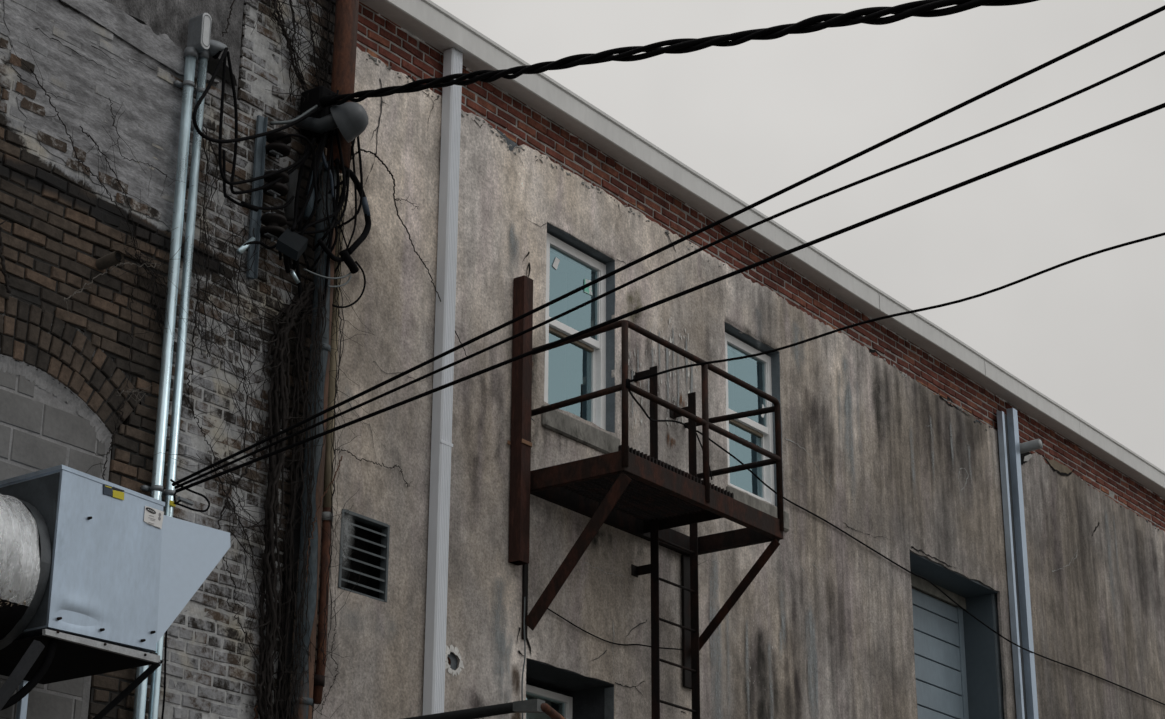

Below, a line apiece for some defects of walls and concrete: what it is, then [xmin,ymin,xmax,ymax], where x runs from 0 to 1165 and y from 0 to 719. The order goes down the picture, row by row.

peeling [9,53,45,117]
peeling [37,130,161,221]
crack [352,75,439,211]
spalling [461,112,650,222]
damp [839,359,859,473]
spalling [1019,443,1074,476]
damp [746,603,818,719]